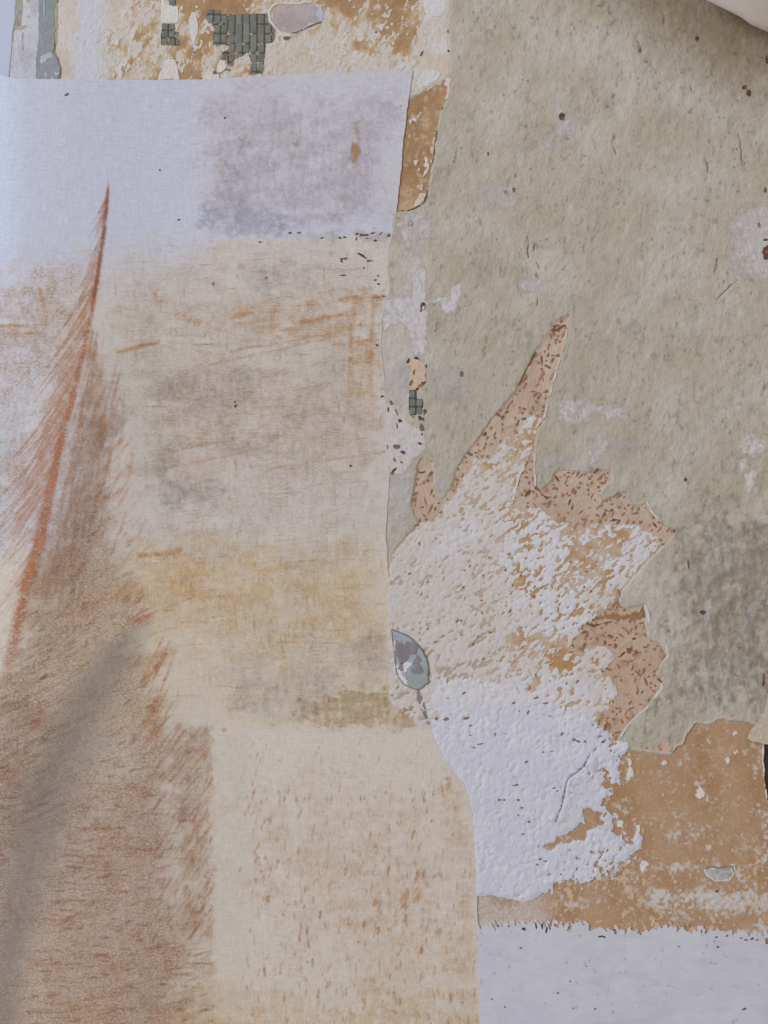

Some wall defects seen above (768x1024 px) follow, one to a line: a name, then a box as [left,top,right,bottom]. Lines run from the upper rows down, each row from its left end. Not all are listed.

flaking render [36,0,451,226]
corrosion [10,187,109,655]
peeling [380,315,768,936]